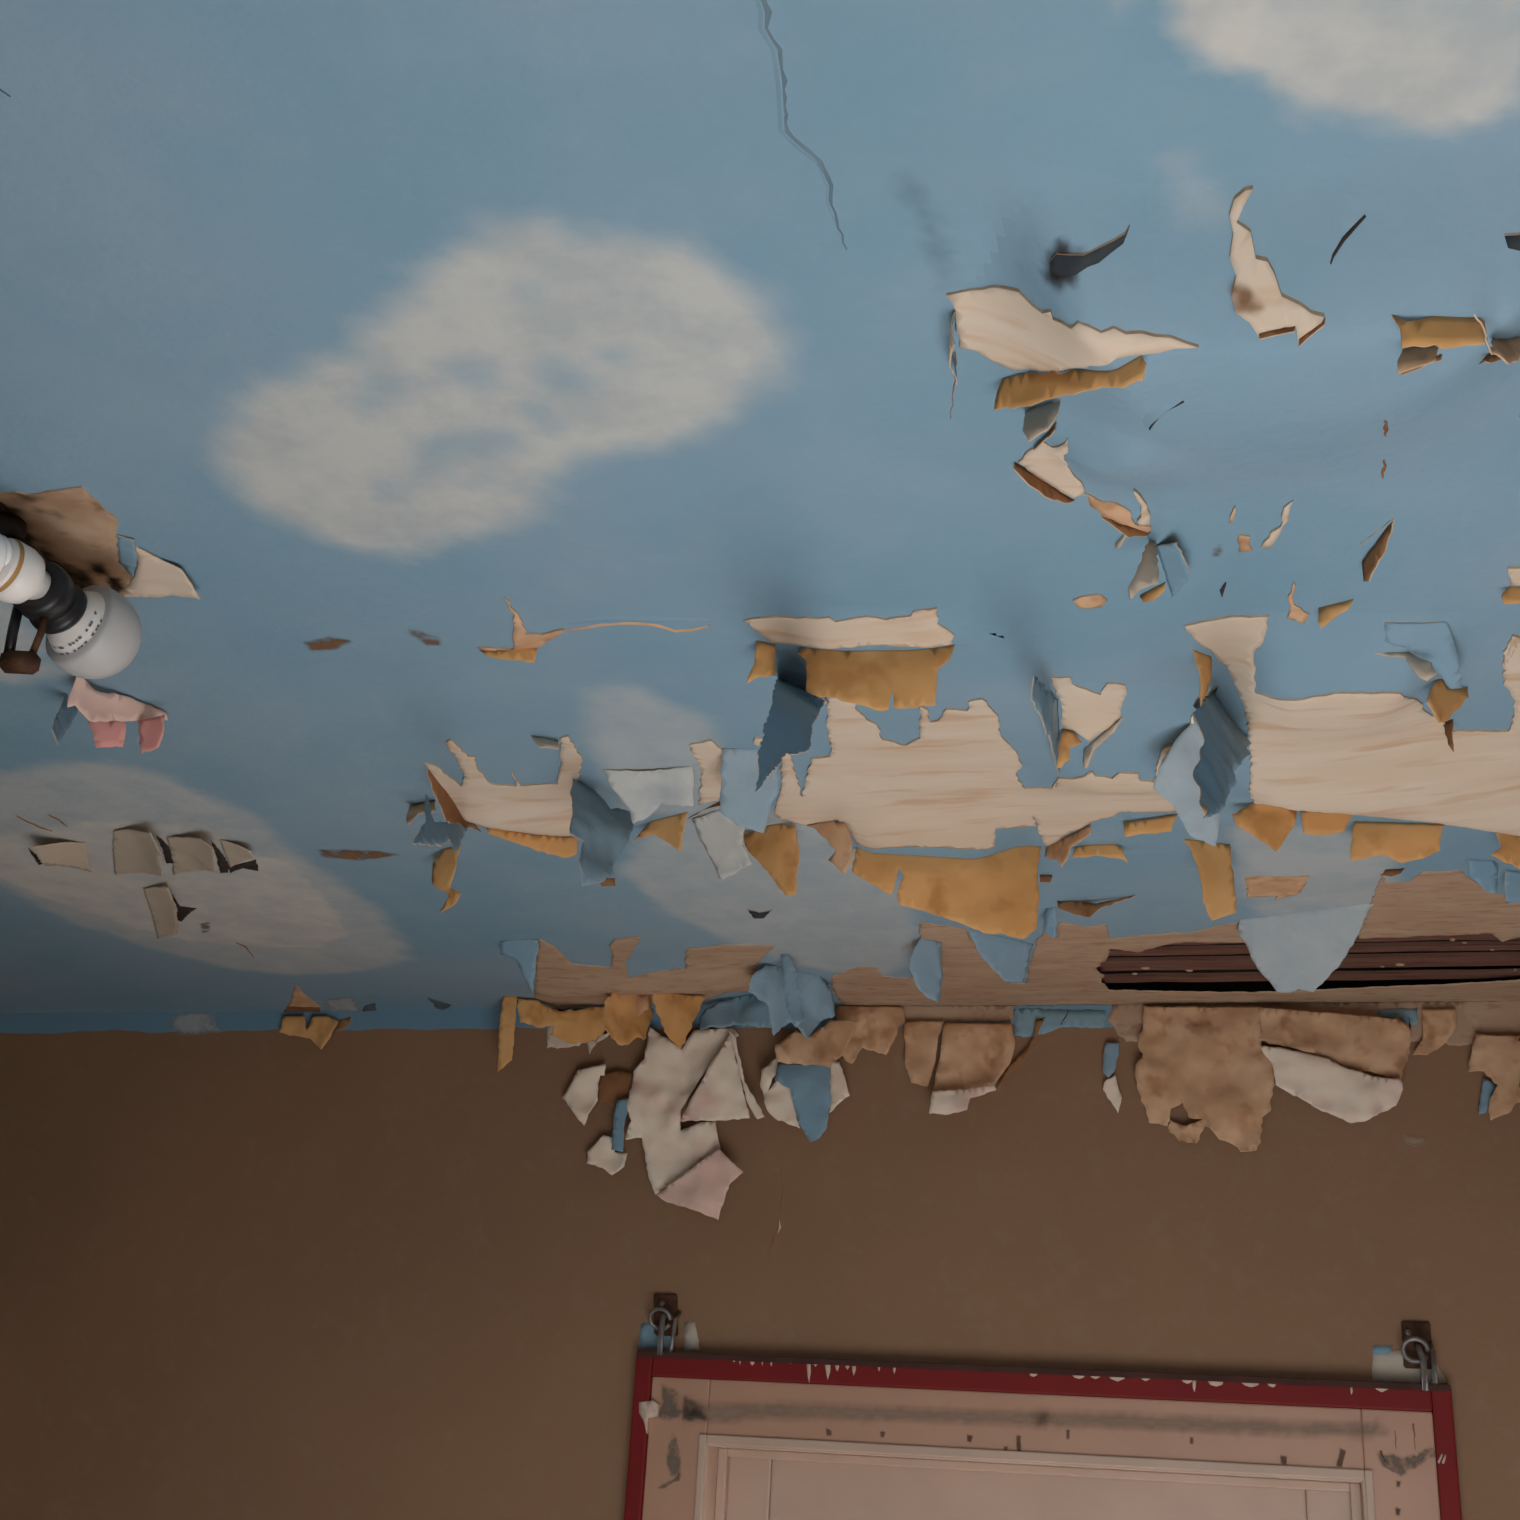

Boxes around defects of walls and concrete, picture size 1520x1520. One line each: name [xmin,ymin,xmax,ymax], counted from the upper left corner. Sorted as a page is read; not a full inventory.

crack [755,0,847,250]
peeling [1229,185,1326,347]
crack [1504,232,1520,251]
peeling [1391,314,1520,375]
peeling [946,285,1199,603]
flaking render [0,486,134,598]
peeling [1360,518,1395,581]
peeling [477,596,564,663]
peeling [1287,582,1354,628]
peeling [51,677,168,754]
peeling [112,829,258,939]
peeling [406,607,1520,1152]